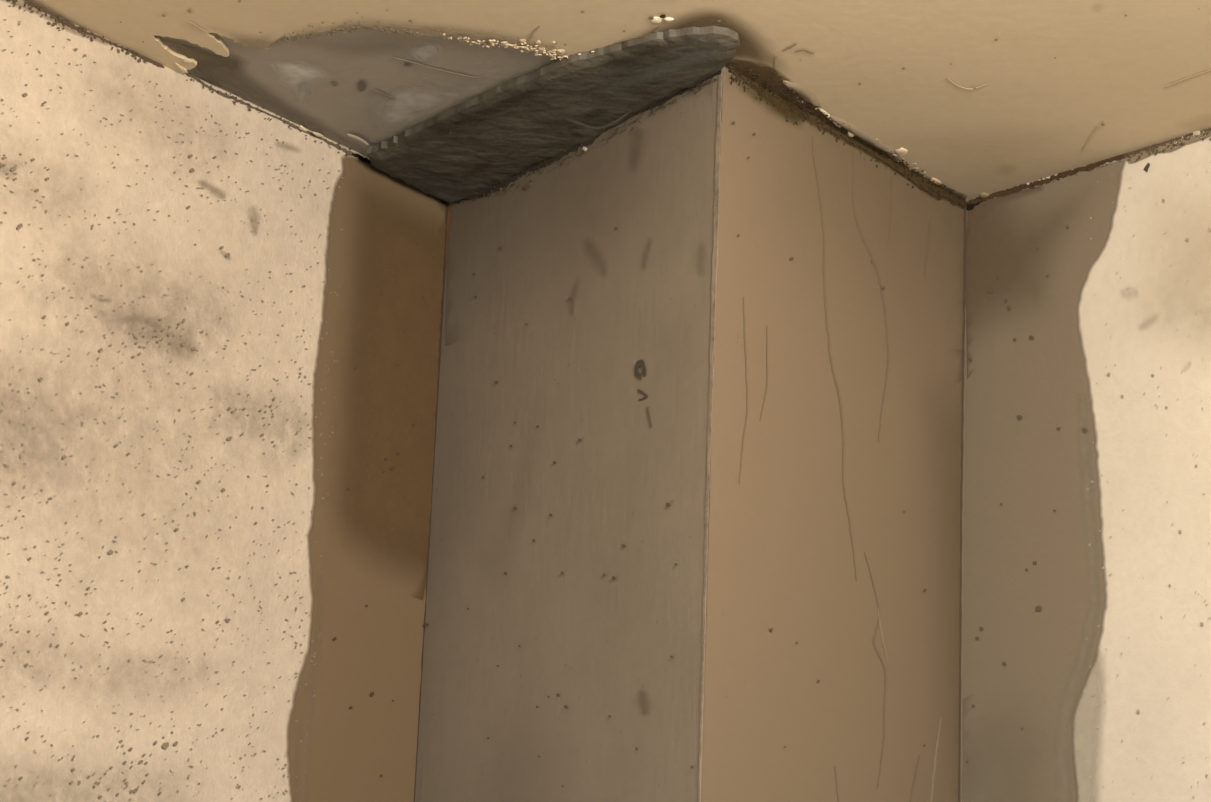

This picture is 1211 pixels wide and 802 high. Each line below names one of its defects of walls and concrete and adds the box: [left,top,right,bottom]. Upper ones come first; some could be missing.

spalling [142,10,567,157]
damp [382,89,457,123]
spalling [98,318,196,359]
spalling [70,740,178,798]